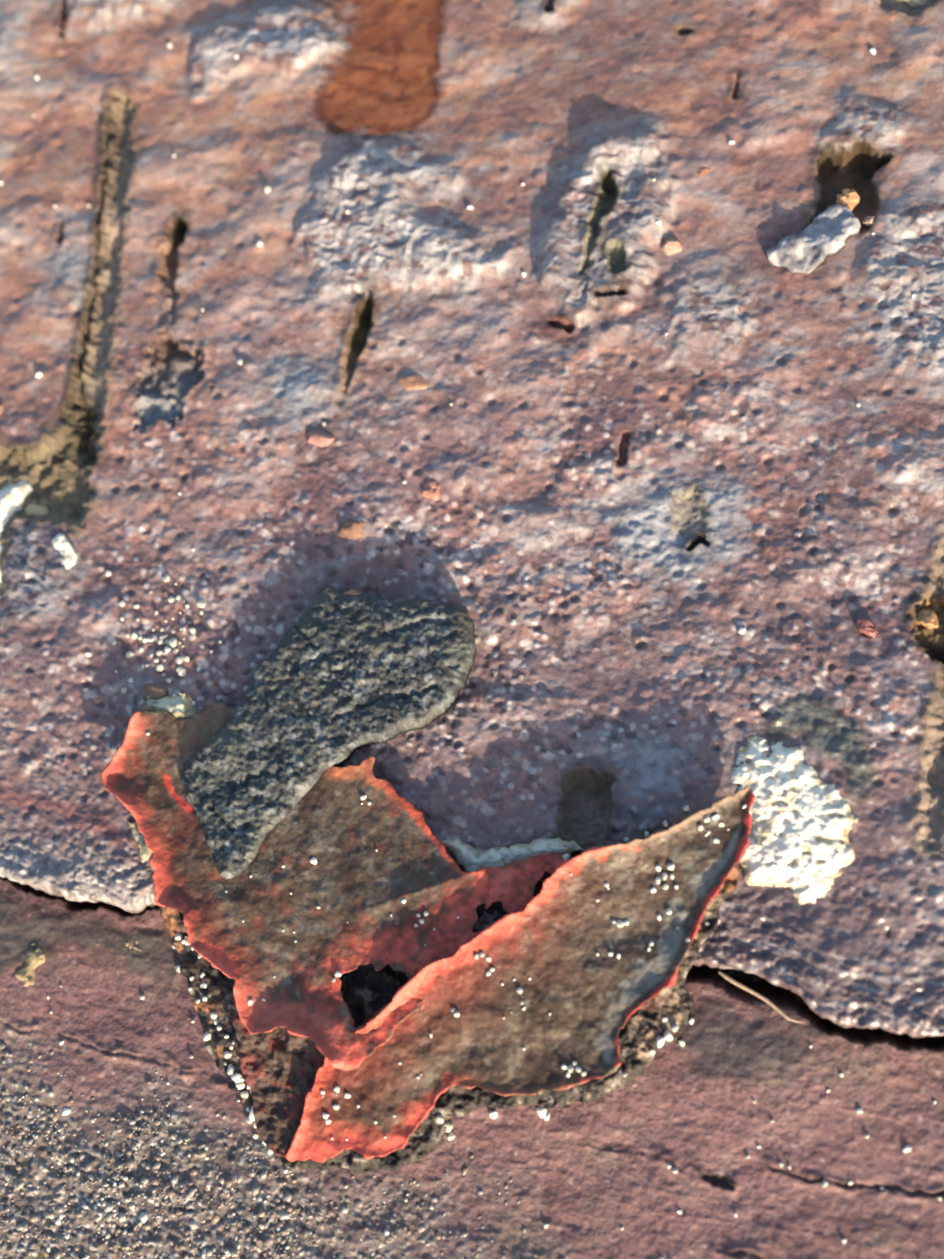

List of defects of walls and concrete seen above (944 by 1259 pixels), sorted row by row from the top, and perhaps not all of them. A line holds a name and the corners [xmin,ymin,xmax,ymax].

spalling [880,0,938,16]
spalling [766,138,891,274]
leakage [0,518,87,624]
leakage [767,696,875,799]
crack [700,1172,735,1189]
crack [767,1164,944,1199]